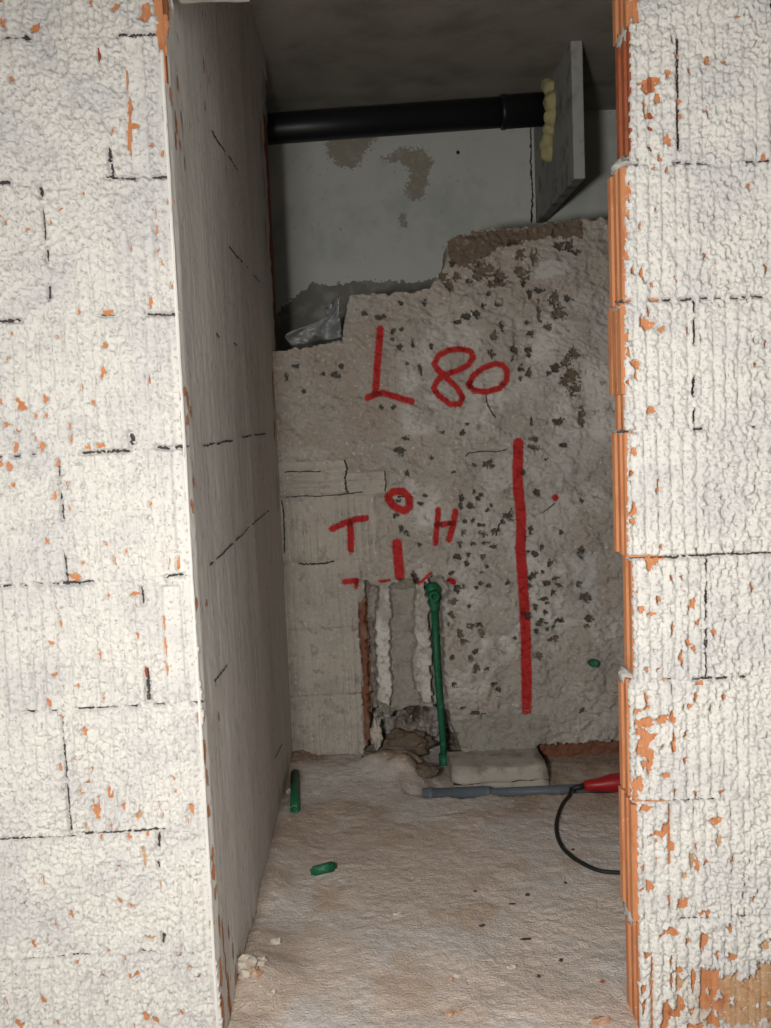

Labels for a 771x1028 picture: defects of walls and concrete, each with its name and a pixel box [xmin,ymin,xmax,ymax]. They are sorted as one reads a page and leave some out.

spalling [576,581,595,628]
flaking render [538,740,620,758]
flaking render [630,680,703,812]
flaking render [659,926,771,1028]